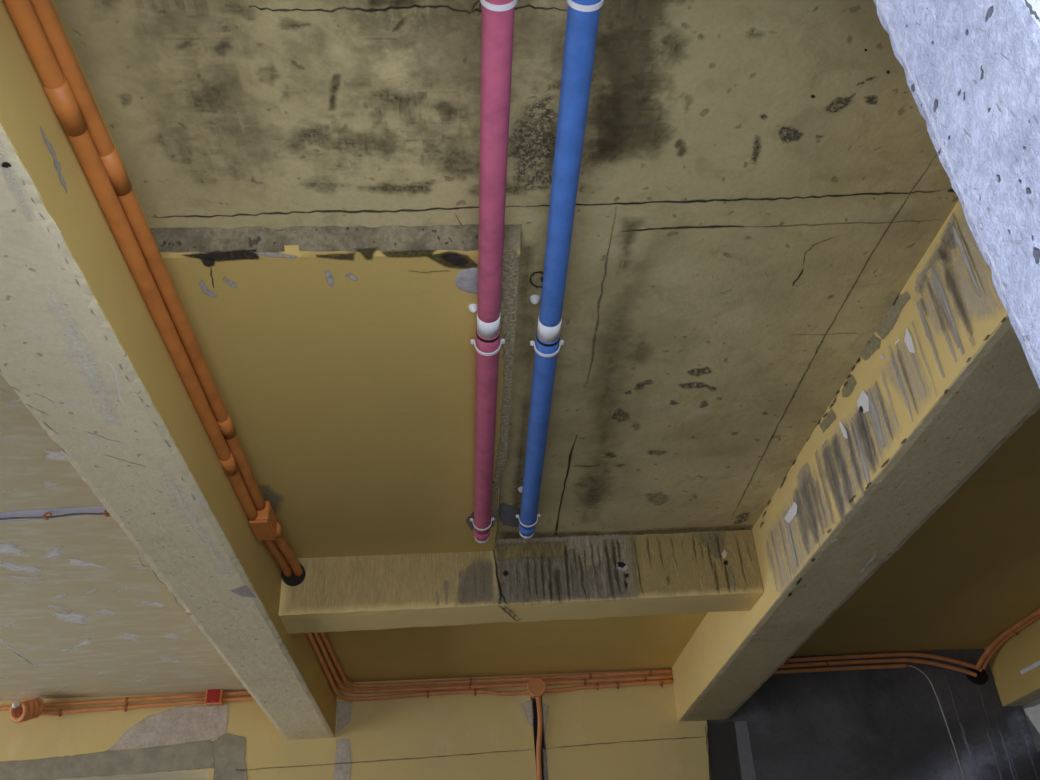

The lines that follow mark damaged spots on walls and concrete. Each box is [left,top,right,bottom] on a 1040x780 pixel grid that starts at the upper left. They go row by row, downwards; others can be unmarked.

crack [249,0,482,12]
leakage [330,76,339,109]
leakage [506,85,557,194]
leakage [372,183,430,192]
crack [157,207,479,227]
spalling [184,249,259,288]
spalling [316,248,478,273]
crack [576,158,955,505]
peeling [817,292,915,439]
leakage [293,216,995,606]
crack [555,436,591,531]
flaking render [1024,704,1040,734]